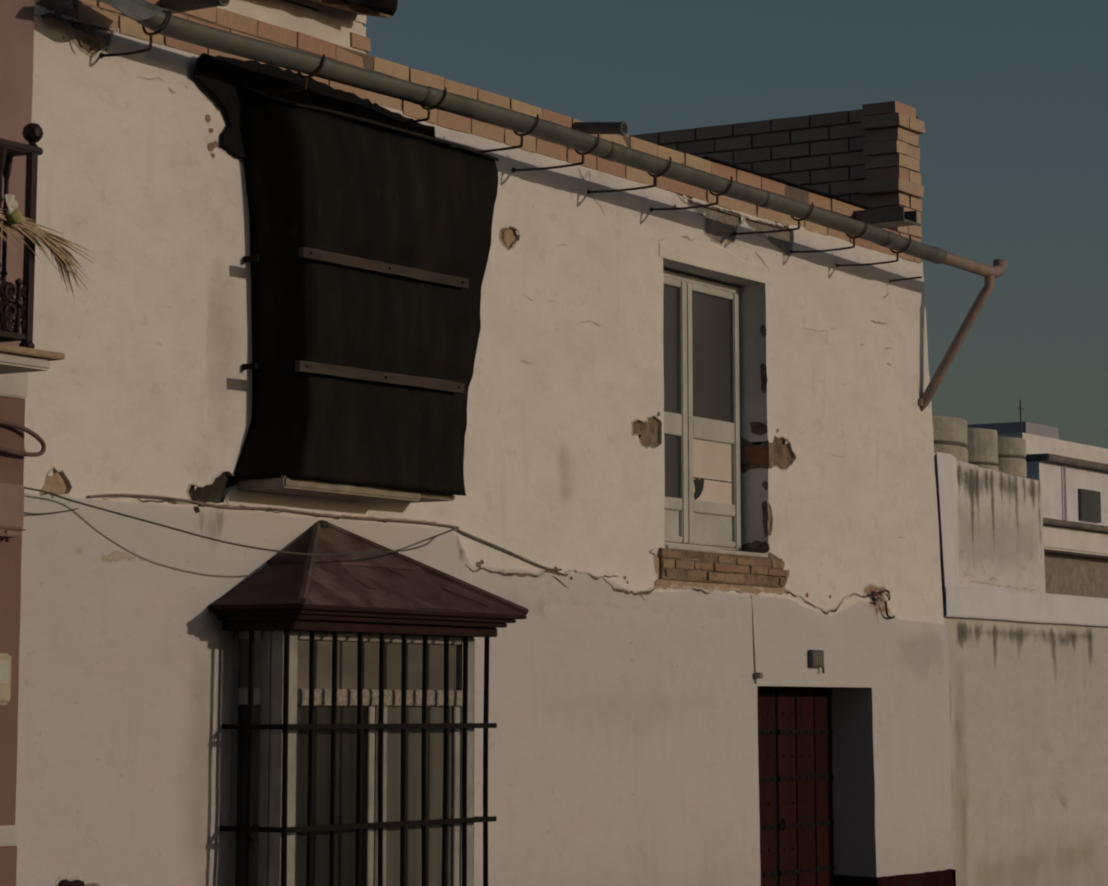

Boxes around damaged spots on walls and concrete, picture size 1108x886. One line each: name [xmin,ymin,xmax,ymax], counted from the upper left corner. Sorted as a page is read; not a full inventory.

flaking render [34,10,116,57]
flaking render [499,226,520,251]
flaking render [674,194,794,258]
flaking render [631,412,662,449]
flaking render [40,466,72,498]
flaking render [186,470,239,513]
flaking render [653,422,796,596]
leakage [958,468,1040,523]
crack [465,560,862,615]
spalling [54,876,89,886]